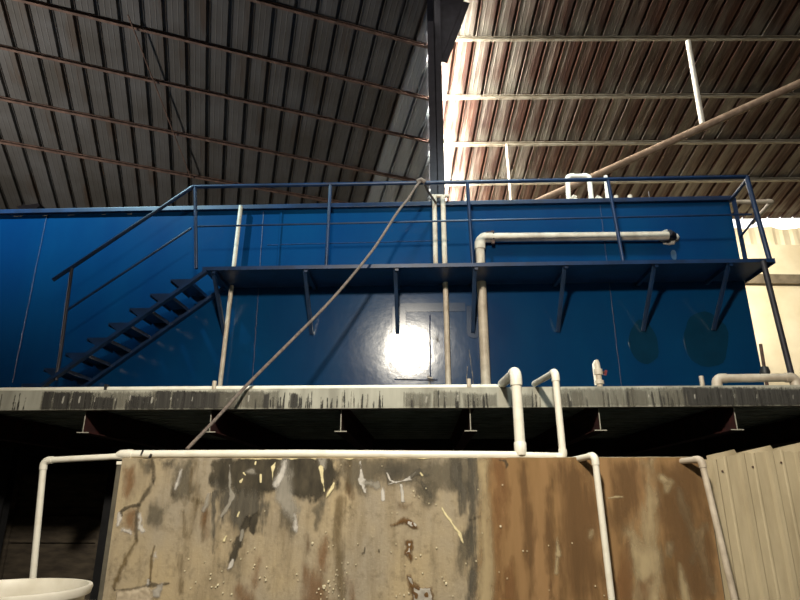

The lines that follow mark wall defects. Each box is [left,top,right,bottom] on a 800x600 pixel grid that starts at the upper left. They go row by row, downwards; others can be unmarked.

leakage [41,391,349,410]
leakage [404,390,496,408]
leakage [522,393,541,407]
leakage [552,387,800,407]
crack [113,459,169,591]
leakage [202,458,493,600]
corrosion [479,457,725,600]
spalling [407,575,433,600]